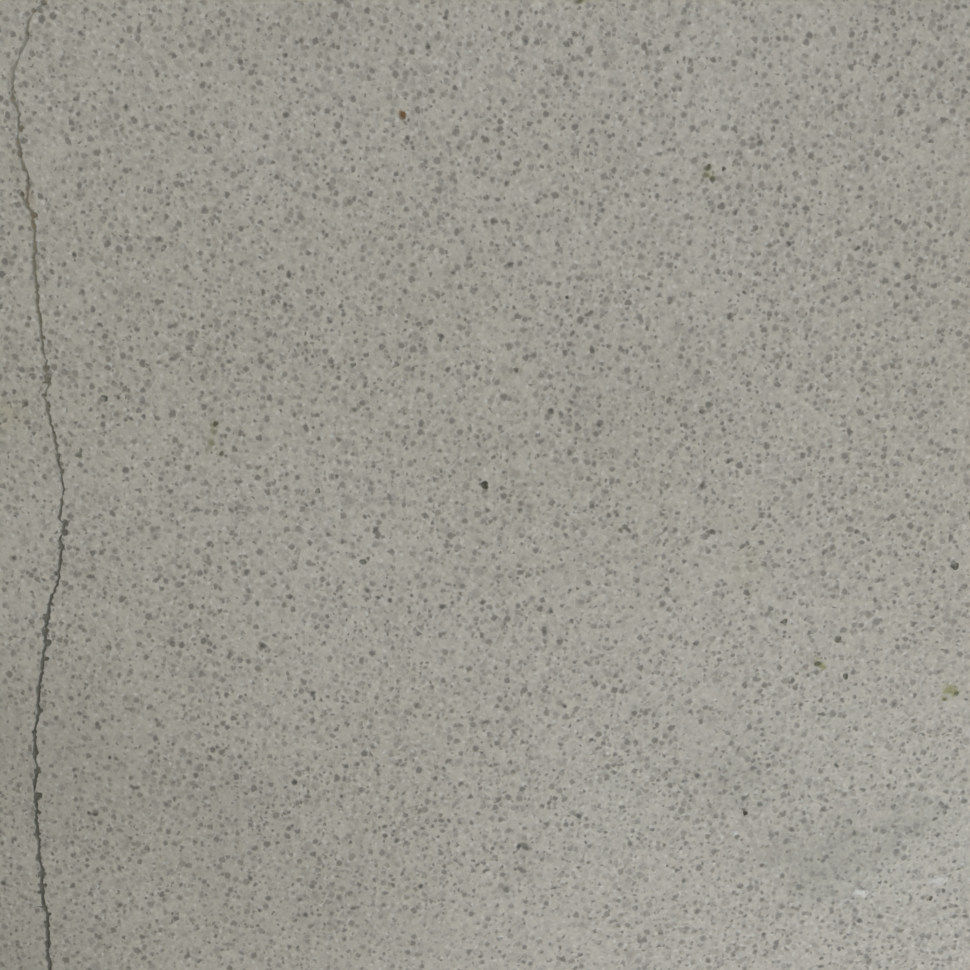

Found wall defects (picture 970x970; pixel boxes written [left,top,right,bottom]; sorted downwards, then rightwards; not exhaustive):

crack [9,0,71,970]